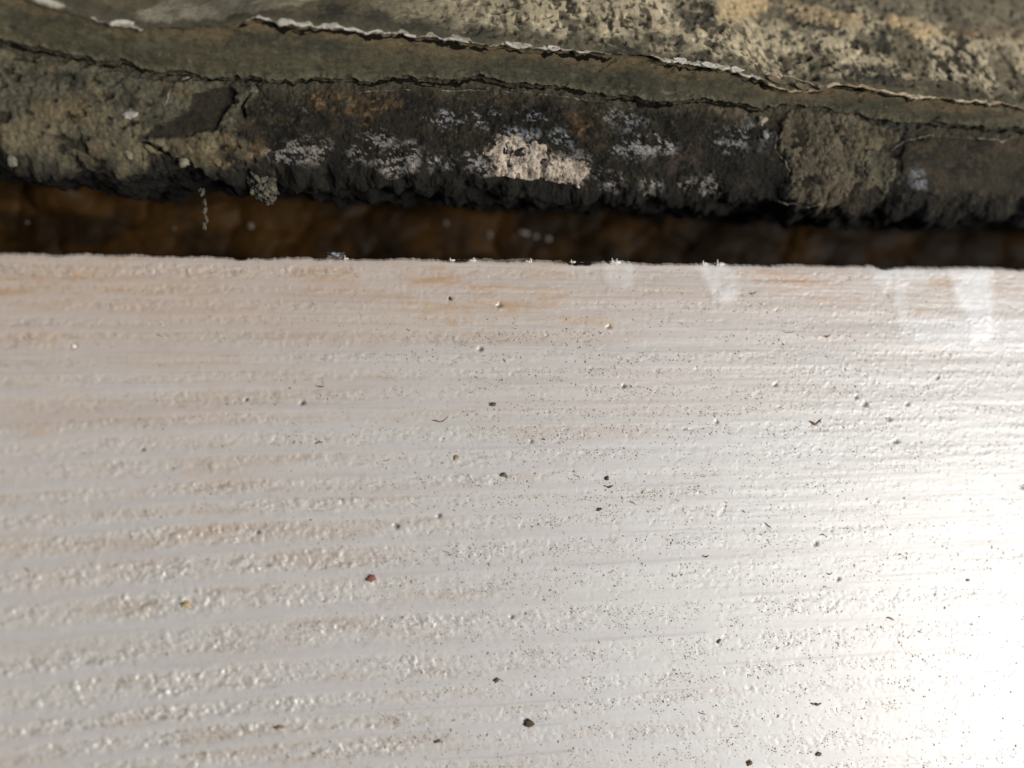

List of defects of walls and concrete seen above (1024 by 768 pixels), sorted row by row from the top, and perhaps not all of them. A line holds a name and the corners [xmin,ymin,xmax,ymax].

peeling [91,0,610,55]
crack [237,21,612,63]
peeling [712,0,866,31]
peeling [880,11,948,44]
crack [3,42,775,116]
peeling [650,54,1024,110]
efflorescence [260,97,783,201]